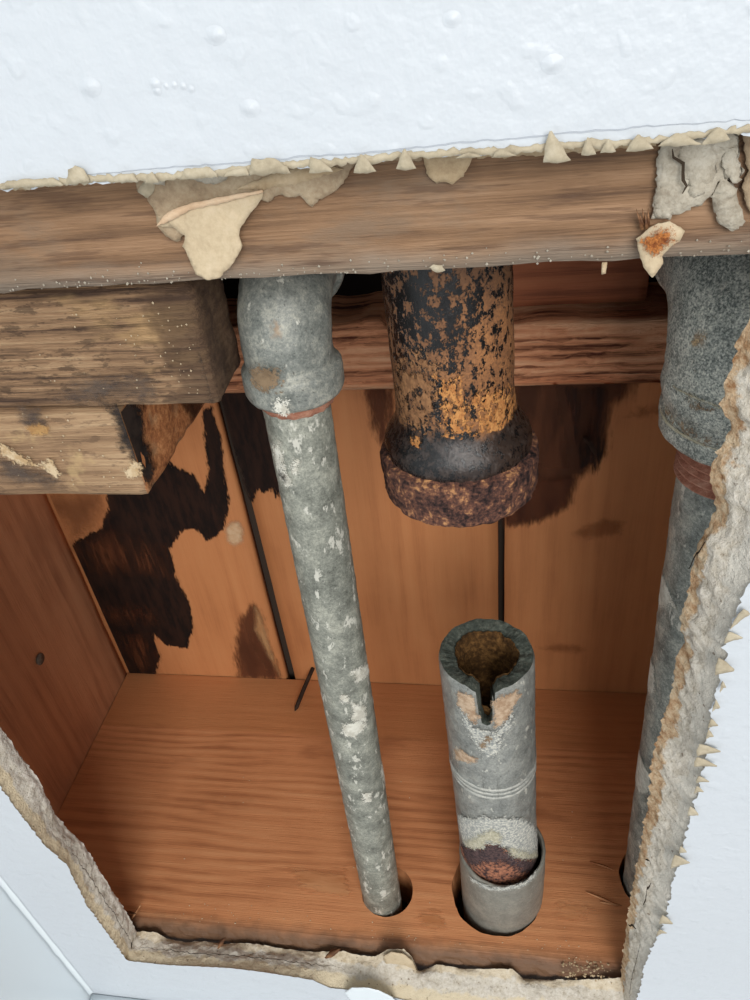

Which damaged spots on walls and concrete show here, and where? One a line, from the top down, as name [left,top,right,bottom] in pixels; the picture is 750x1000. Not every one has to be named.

crack [672,149,688,194]
flaking render [650,134,746,232]
rust [640,226,676,258]
leakage [365,389,393,442]
leakage [503,383,630,525]
leakage [72,364,285,679]
spalling [0,319,750,1000]